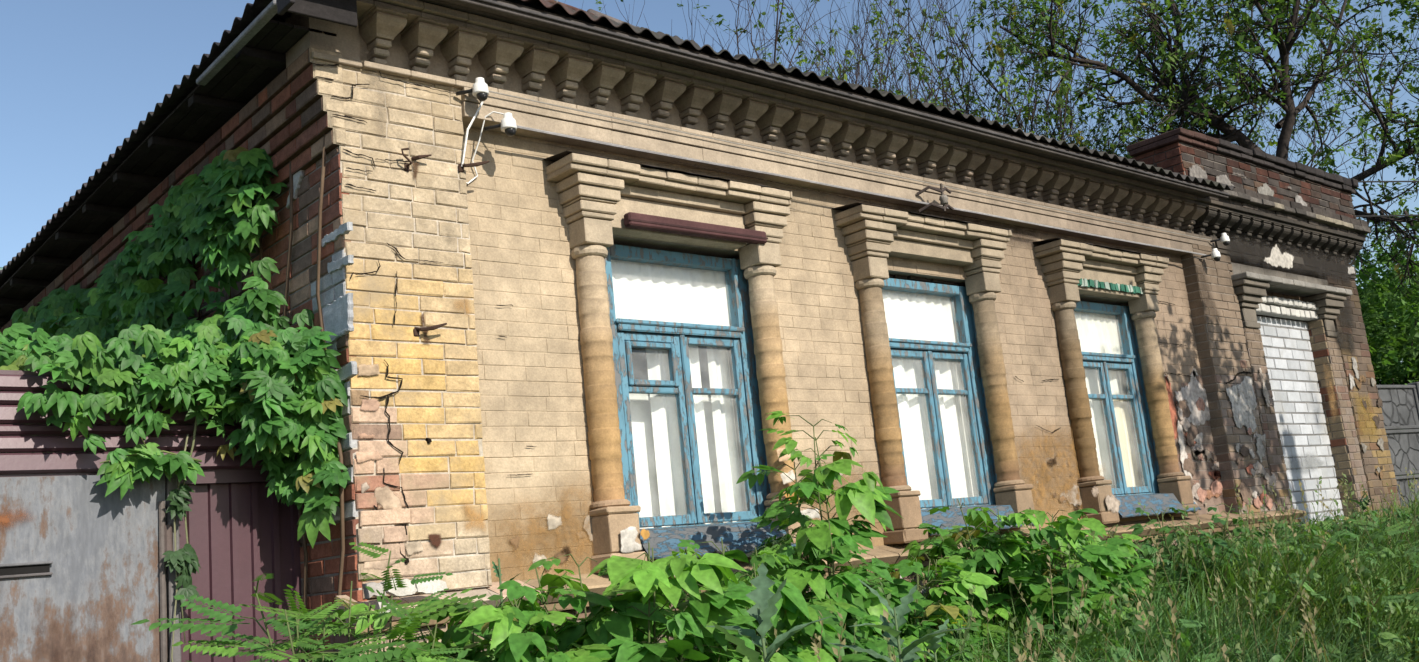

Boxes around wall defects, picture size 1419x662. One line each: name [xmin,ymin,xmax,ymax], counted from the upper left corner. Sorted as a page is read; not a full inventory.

peeling [321,222,354,274]
peeling [322,293,354,344]
crack [350,243,443,325]
flaking render [1264,245,1294,269]
crack [360,360,409,562]
flaking render [1164,368,1276,510]